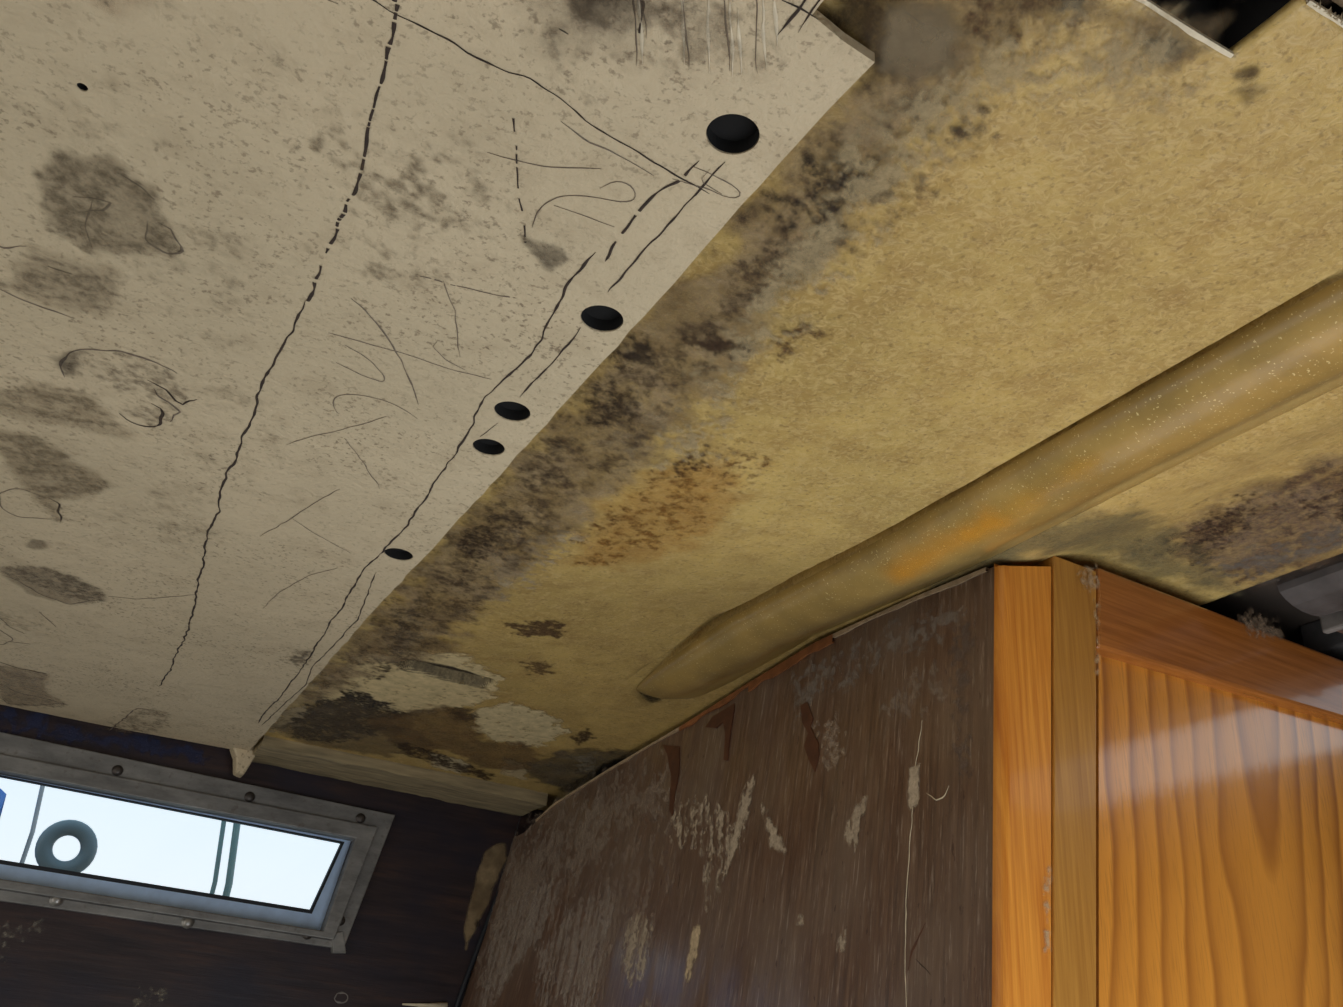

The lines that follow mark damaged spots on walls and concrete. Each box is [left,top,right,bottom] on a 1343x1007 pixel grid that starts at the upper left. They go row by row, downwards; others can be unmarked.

damp [36,154,155,248]
damp [132,221,184,255]
crack [109,0,400,686]
damp [280,33,1170,792]
damp [0,436,107,522]
damp [974,462,1343,584]
peeling [269,650,571,780]
peeling [703,776,786,882]
peeling [845,797,865,844]
spalling [908,764,949,809]